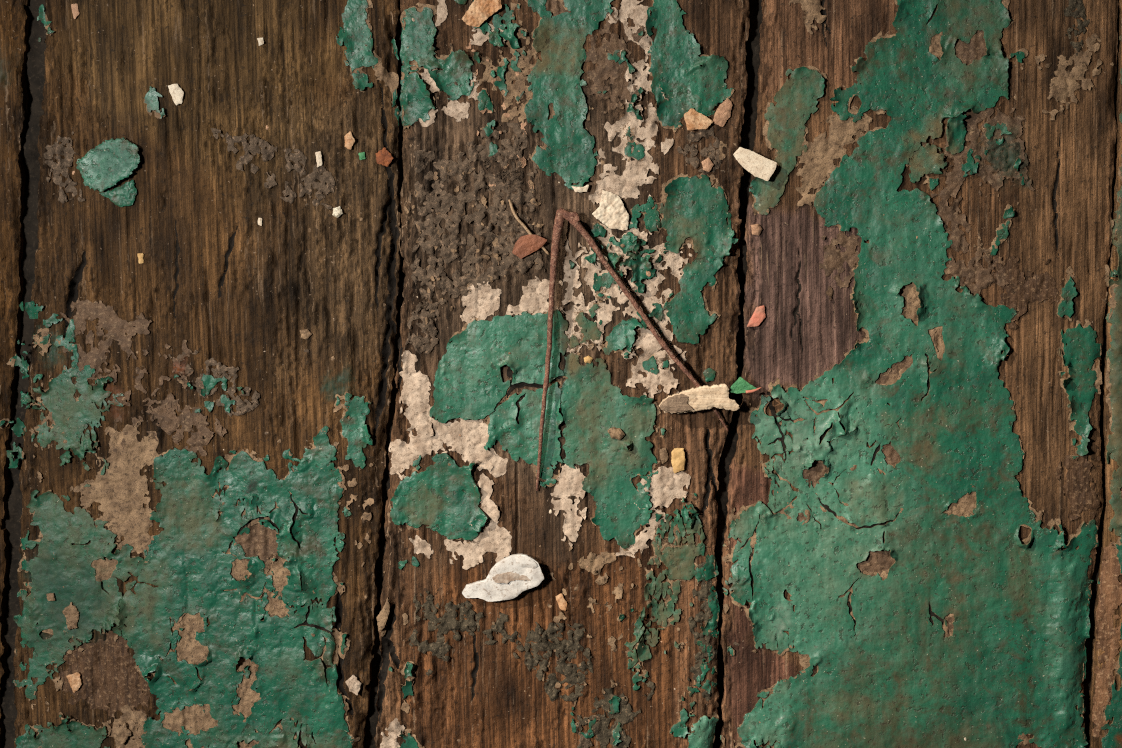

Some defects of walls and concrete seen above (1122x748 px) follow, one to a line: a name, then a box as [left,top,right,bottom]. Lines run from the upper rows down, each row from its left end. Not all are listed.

peeling [336,0,381,93]
peeling [344,131,355,150]
crack [373,80,403,445]
peeling [377,0,1122,748]
crack [701,427,717,517]
crack [767,391,854,463]
crack [871,444,880,466]
peeling [0,301,374,748]
crack [741,521,759,595]
crack [818,497,899,543]
crack [846,583,856,636]
crack [292,591,400,723]